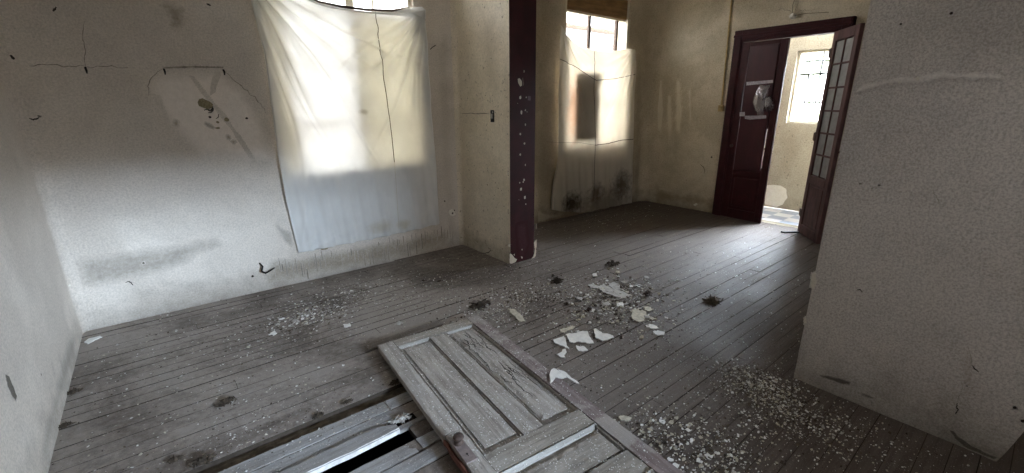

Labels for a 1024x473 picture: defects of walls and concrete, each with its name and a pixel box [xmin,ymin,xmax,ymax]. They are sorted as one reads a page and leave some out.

crack [34,21,162,96]
peeling [508,224,537,264]